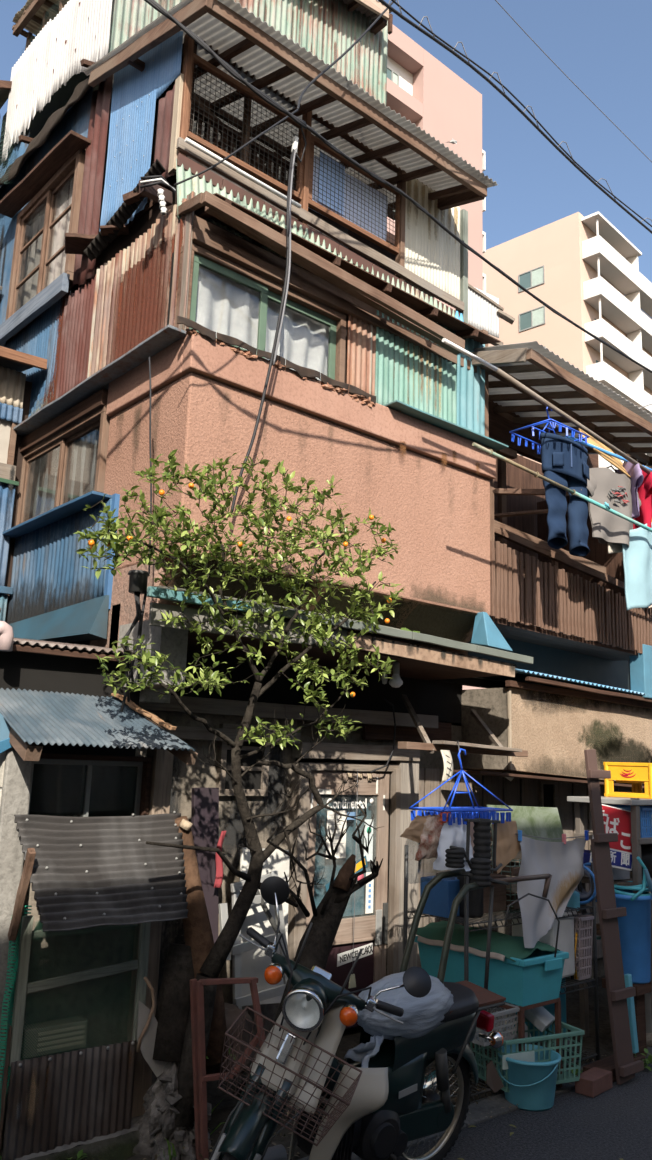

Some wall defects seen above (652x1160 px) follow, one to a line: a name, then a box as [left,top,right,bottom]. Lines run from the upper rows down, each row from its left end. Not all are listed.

corrosion [94,217,183,363]
spalling [177,316,376,407]
corrosion [394,326,442,388]
water stain [526,688,652,777]